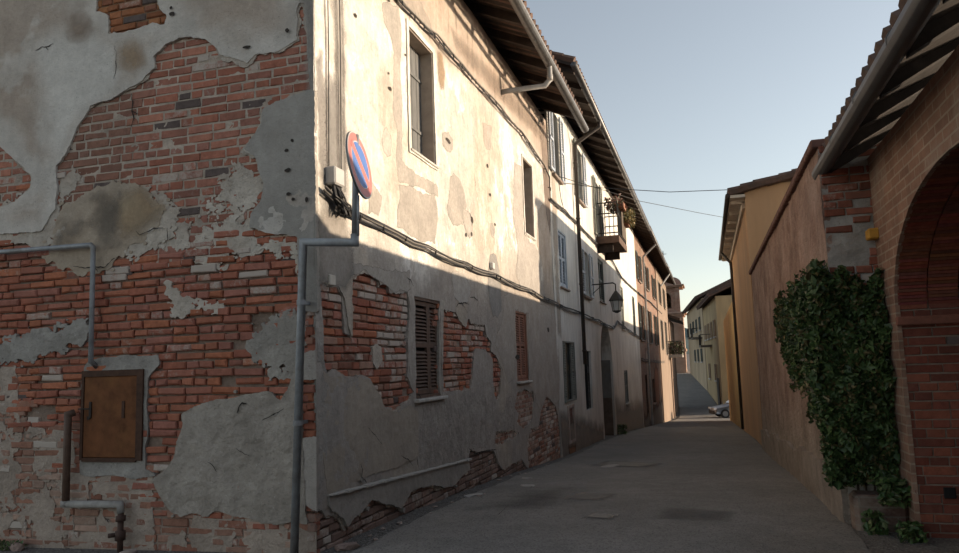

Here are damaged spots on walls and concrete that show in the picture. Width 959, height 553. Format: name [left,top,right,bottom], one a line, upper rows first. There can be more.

flaking render [0,0,561,553]